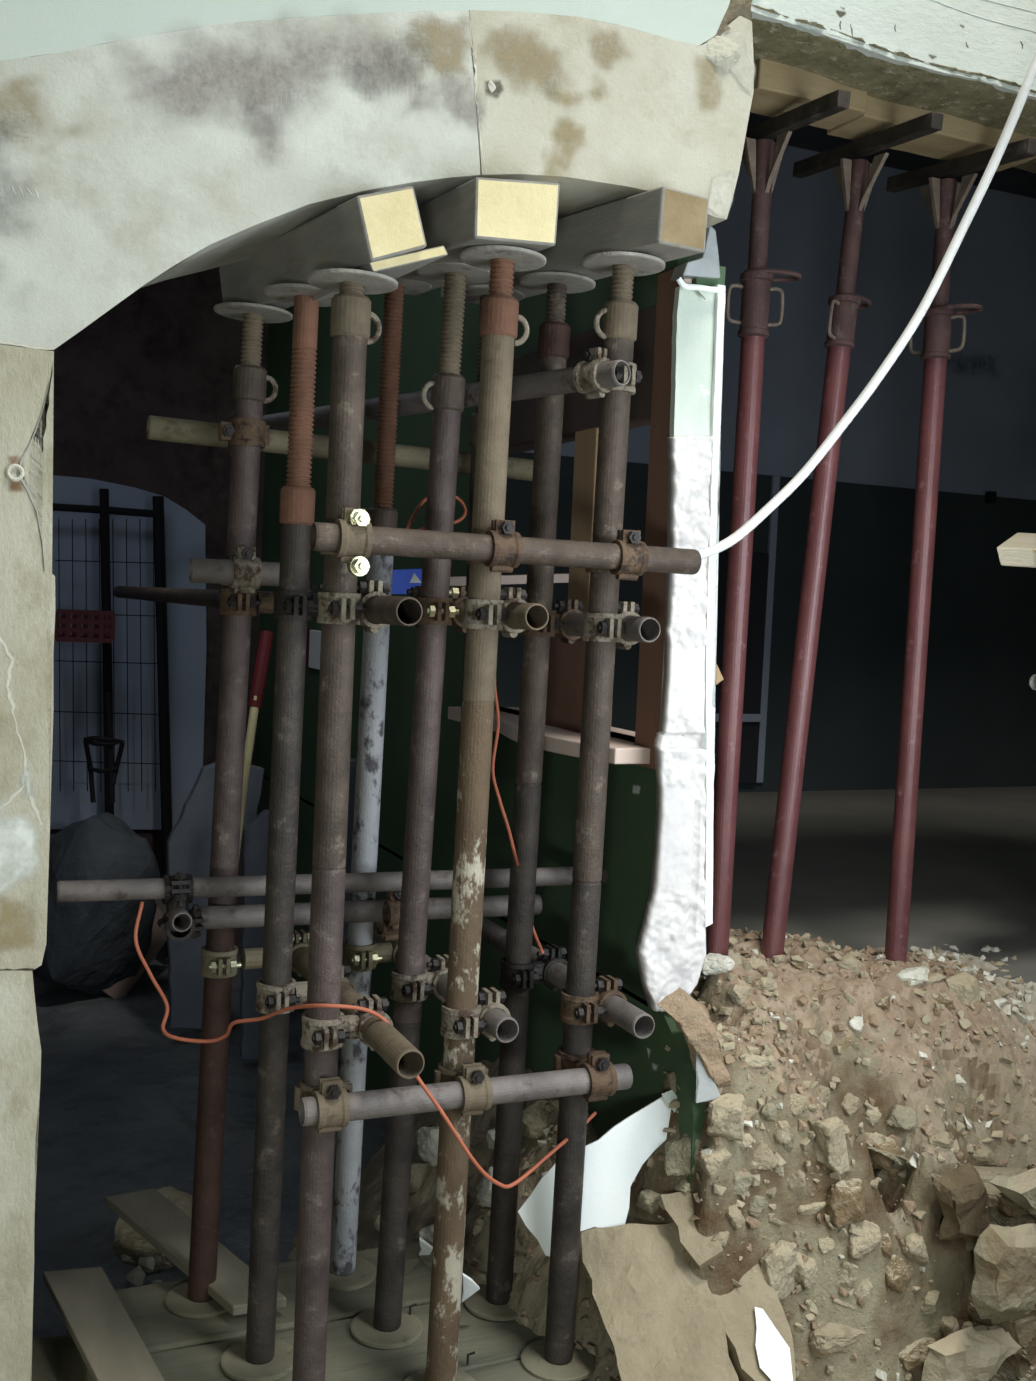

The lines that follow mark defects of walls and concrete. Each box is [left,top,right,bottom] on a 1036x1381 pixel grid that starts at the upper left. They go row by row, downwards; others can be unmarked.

water stain [160,48,326,110]
water stain [345,23,465,72]
spalling [702,0,1036,137]
crack [0,637,42,826]